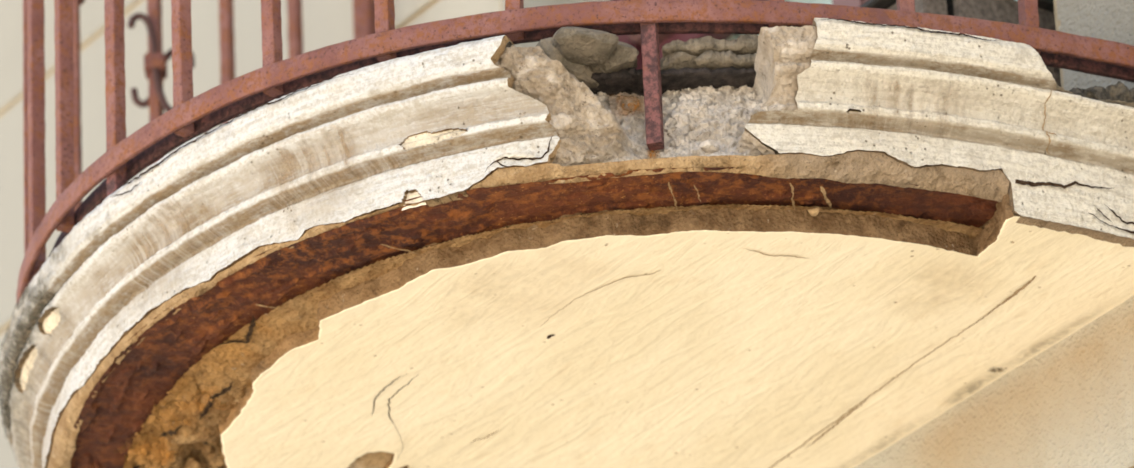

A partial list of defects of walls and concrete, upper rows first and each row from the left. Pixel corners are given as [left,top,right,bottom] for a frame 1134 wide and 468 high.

crack [1042,90,1056,154]
spalling [123,25,1010,468]
crack [1015,179,1134,234]
flaking render [20,348,38,390]
flaking render [43,308,61,334]
spalling [48,192,427,468]
crack [770,276,1036,468]
crack [371,374,418,459]